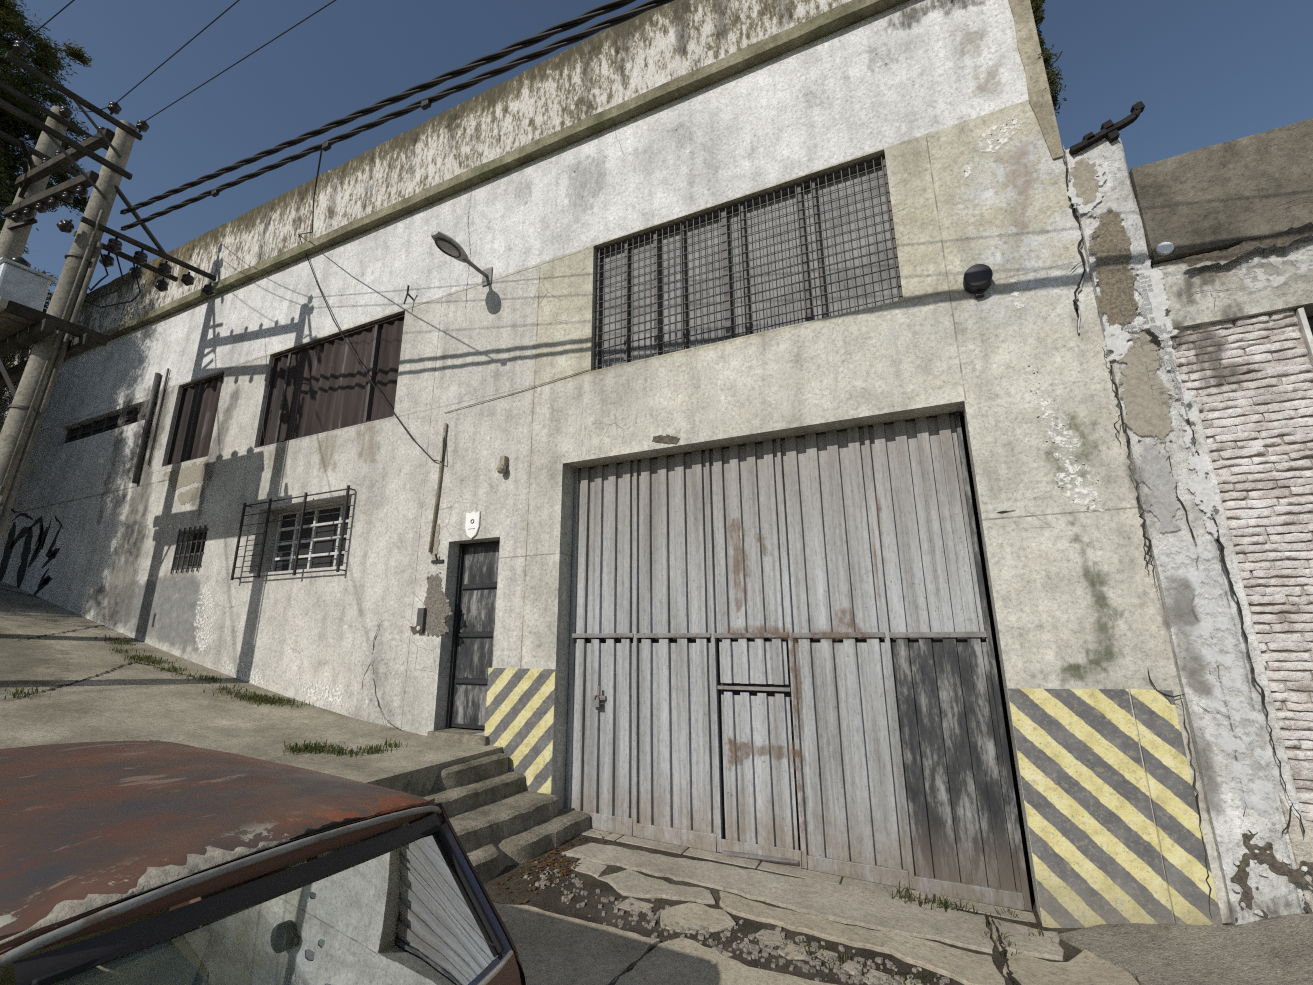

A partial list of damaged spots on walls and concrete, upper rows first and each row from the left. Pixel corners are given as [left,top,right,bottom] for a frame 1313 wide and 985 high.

damp [672,0,688,53]
flaking render [1183,222,1313,291]
crack [1062,145,1158,591]
flaking render [1066,156,1182,533]
damp [1063,571,1113,679]
crack [1148,339,1305,918]
flaking render [1230,828,1313,921]
crack [990,914,1021,985]